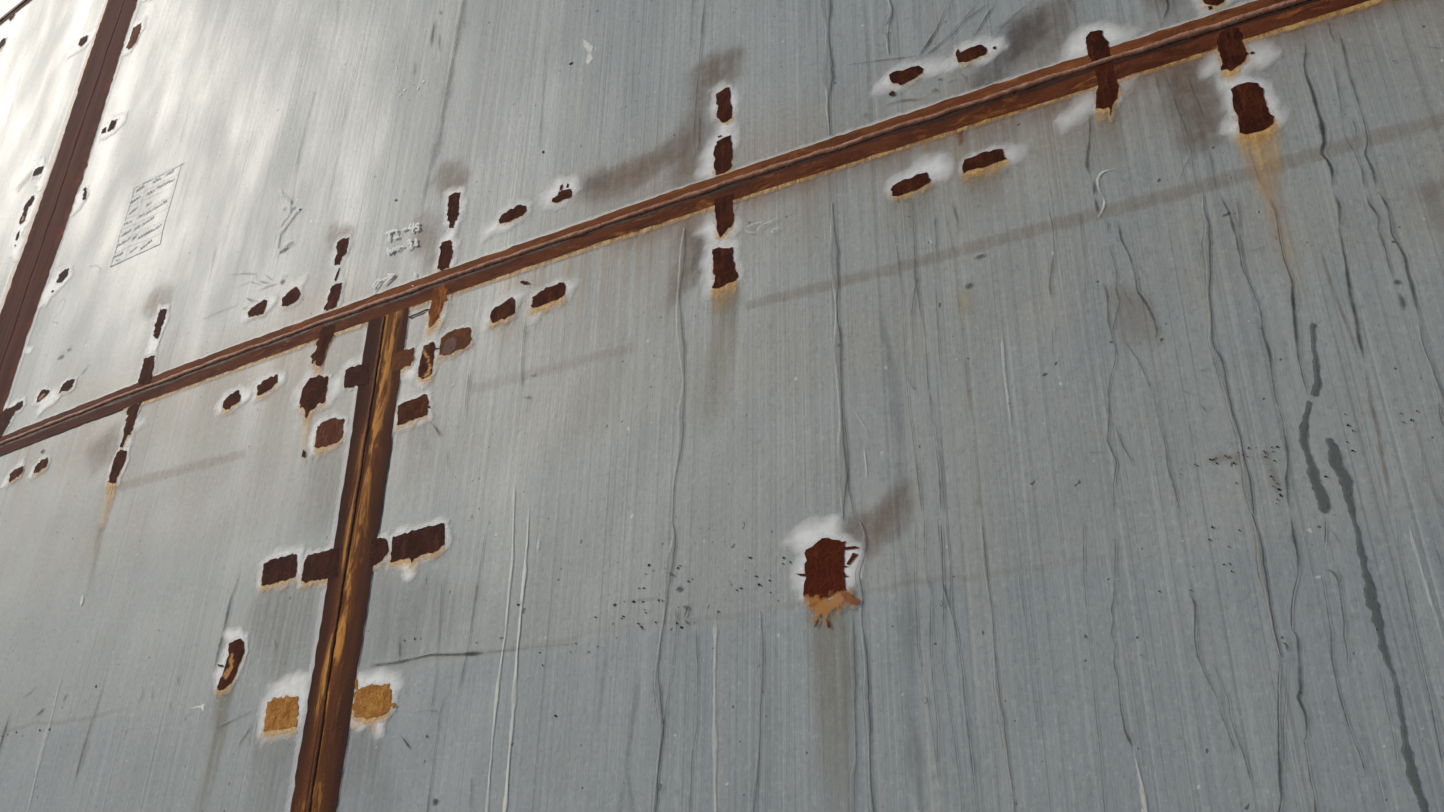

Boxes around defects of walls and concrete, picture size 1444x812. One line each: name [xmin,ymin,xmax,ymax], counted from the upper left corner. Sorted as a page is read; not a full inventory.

corrosion [1109,0,1288,56]
corrosion [1232,0,1369,43]
corrosion [1341,0,1381,12]
corrosion [1113,28,1284,162]
corrosion [0,0,1136,812]